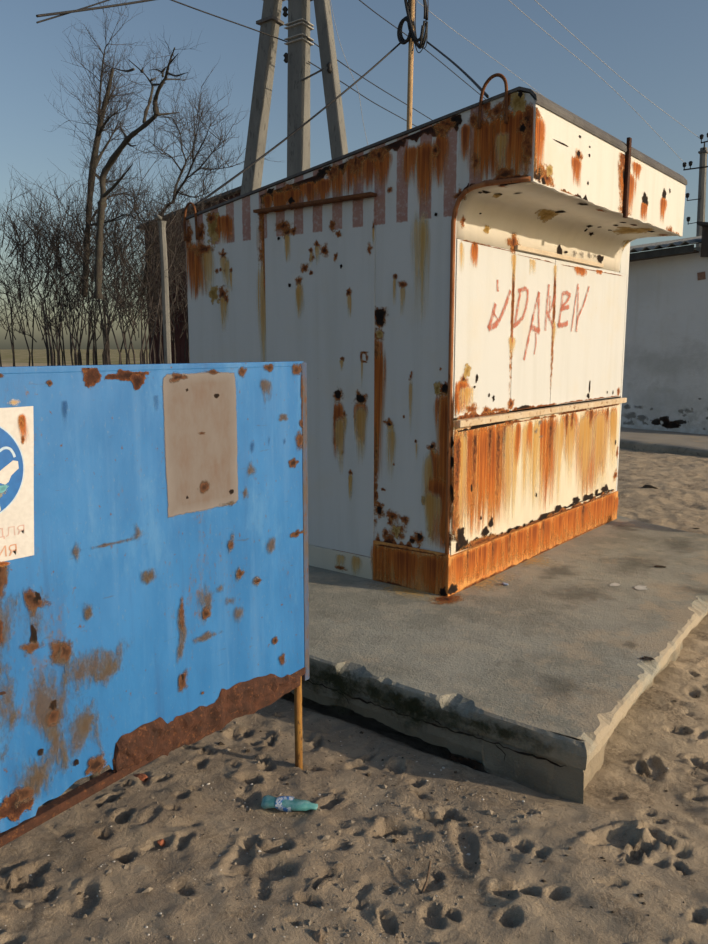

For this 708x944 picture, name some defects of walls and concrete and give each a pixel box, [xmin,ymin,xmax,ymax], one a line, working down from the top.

corrosion [186,212,233,320]
corrosion [258,90,545,352]
corrosion [460,233,621,382]
corrosion [572,150,583,182]
corrosion [618,153,641,226]
corrosion [82,368,149,390]
corrosion [289,364,303,468]
corrosion [333,329,620,604]
spalling [624,398,701,429]
corrosion [178,598,215,657]
corrosion [86,653,301,775]
corrosion [0,786,35,824]